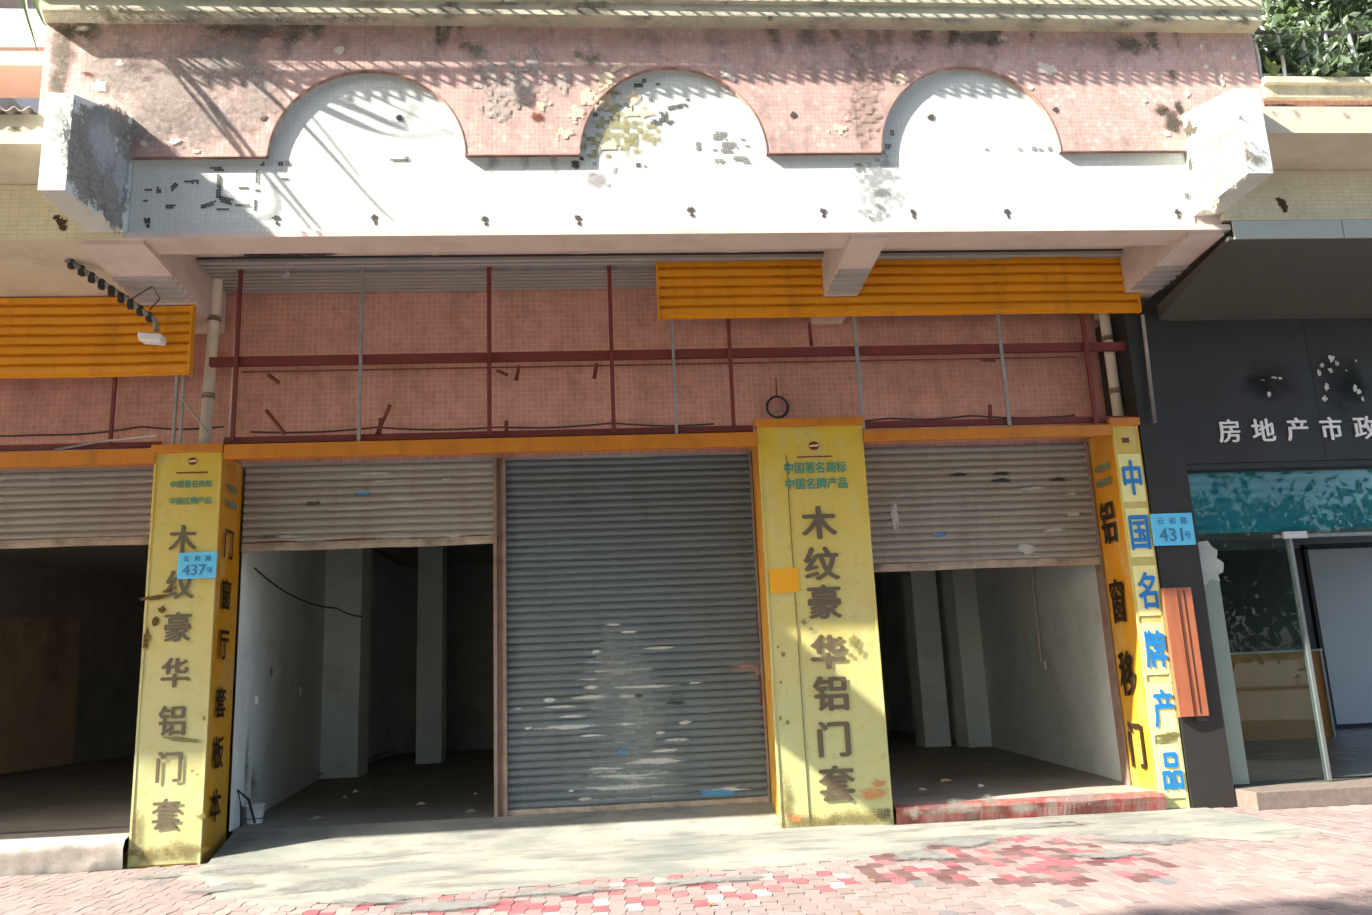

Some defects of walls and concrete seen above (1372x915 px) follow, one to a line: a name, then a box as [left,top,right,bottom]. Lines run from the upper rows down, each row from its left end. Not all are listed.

peeling [466,48,689,139]
peeling [57,79,290,234]
peeling [571,141,621,187]